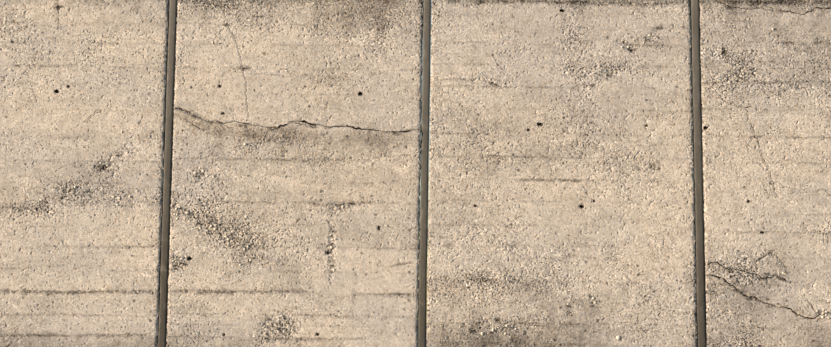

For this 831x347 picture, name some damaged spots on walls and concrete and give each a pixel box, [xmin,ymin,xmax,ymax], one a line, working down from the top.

crack [176,2,419,136]
crack [706,250,831,320]